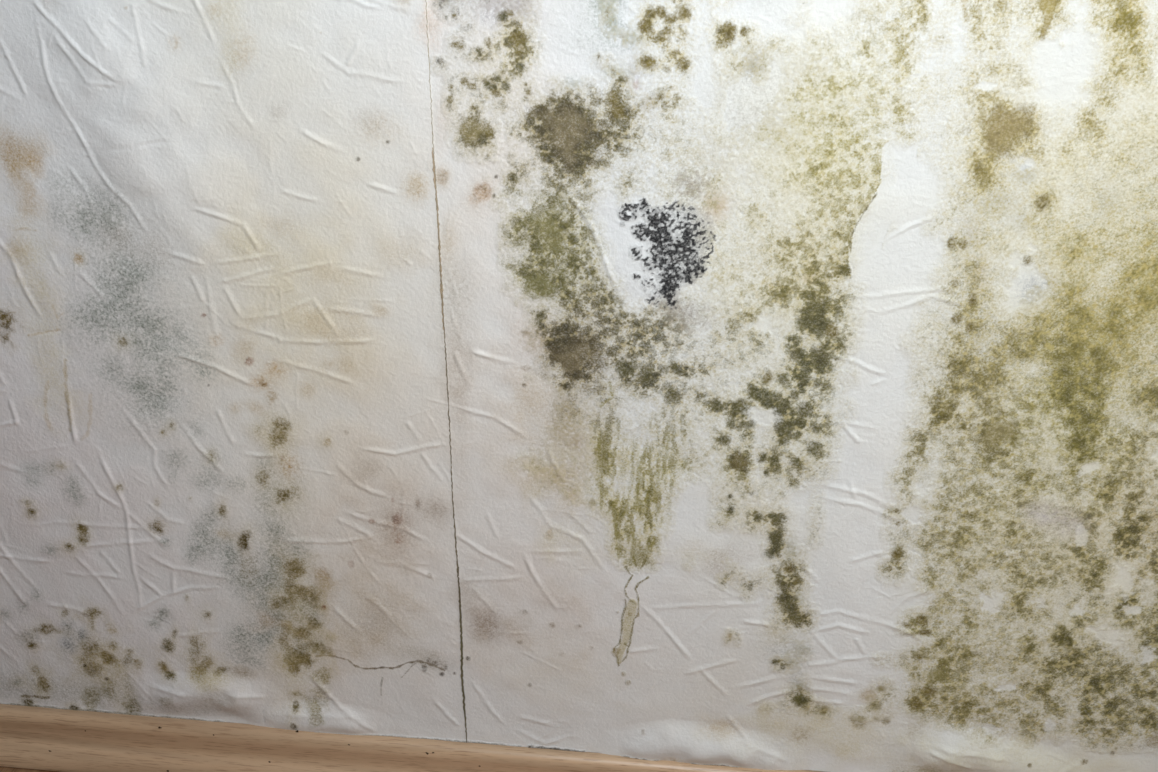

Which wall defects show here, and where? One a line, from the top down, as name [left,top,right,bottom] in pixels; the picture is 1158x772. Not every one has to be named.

damp [0,0,634,732]
damp [459,0,1158,772]